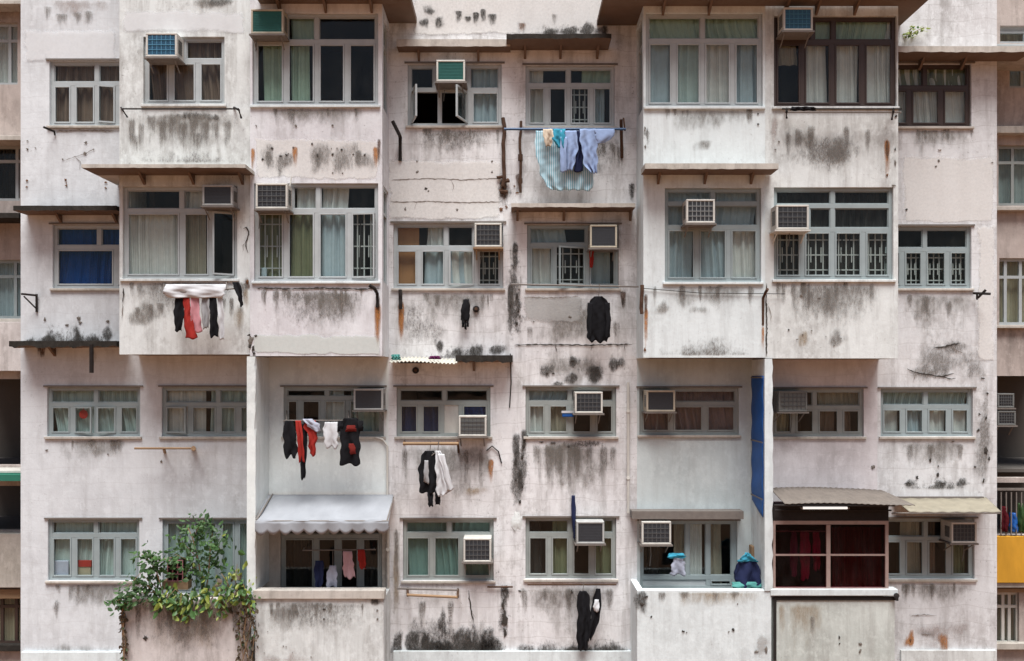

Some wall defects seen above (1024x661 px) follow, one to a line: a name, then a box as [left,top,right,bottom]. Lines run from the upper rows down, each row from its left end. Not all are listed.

damp [456,9,496,22]
damp [129,112,231,143]
damp [772,122,850,165]
damp [130,283,175,323]
damp [777,283,873,313]
damp [26,327,112,341]
crack [908,343,962,381]
damp [511,430,615,503]
damp [392,585,509,651]